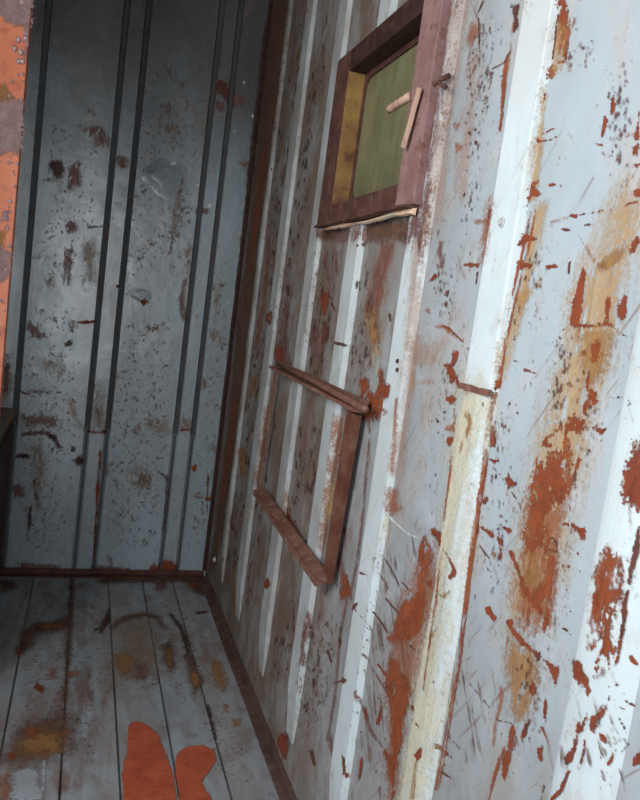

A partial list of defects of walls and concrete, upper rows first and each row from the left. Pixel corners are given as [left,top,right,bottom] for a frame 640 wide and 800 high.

rust [510,3,519,33]
rust [543,0,593,80]
rust [599,62,636,168]
rust [49,160,82,188]
rust [290,130,314,247]
rust [305,0,511,472]
rust [489,179,640,651]
rust [284,424,319,527]
rust [383,206,551,800]
rust [586,526,640,678]